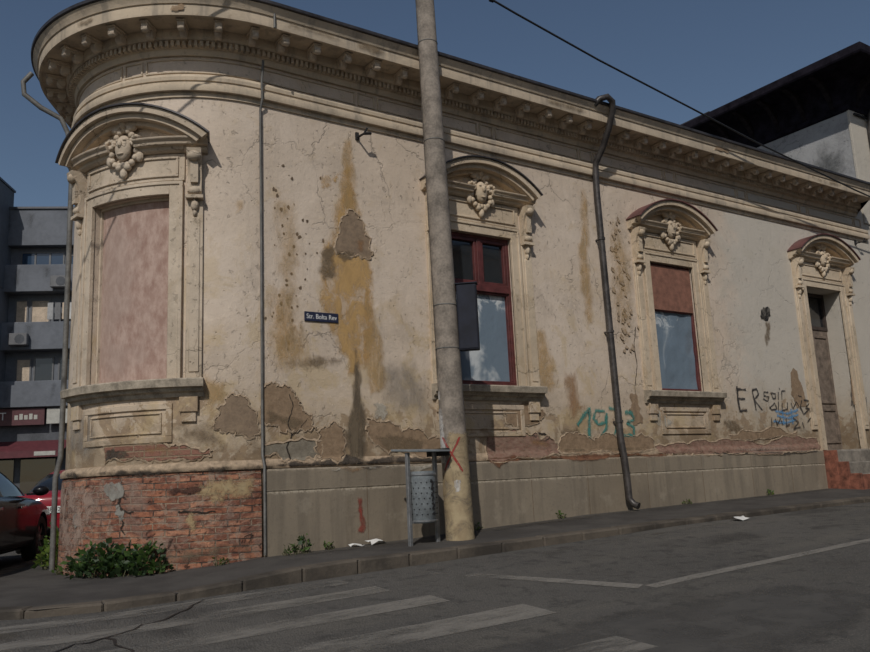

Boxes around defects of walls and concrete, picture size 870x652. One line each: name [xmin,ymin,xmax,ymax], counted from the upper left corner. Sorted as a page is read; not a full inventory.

spalling [322,208,374,261]
damp [321,145,393,458]
damp [580,228,590,304]
spalling [211,381,347,465]
spalling [365,417,441,459]
spalling [484,393,822,463]